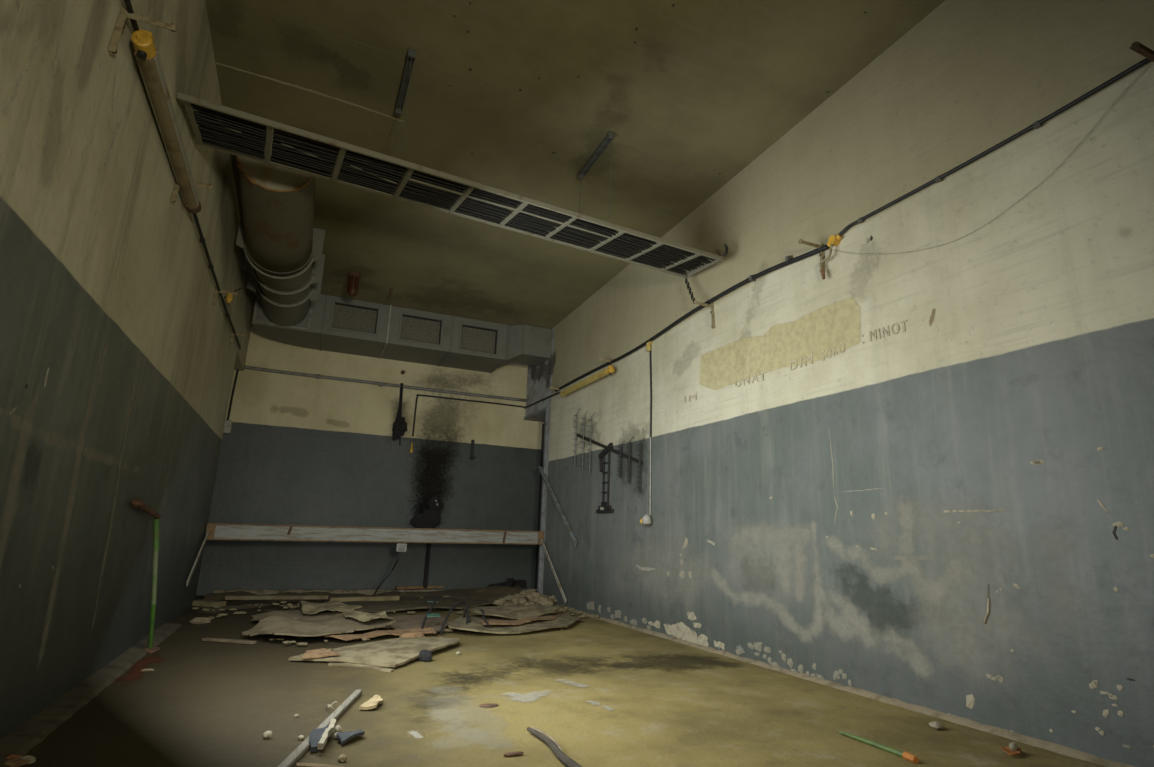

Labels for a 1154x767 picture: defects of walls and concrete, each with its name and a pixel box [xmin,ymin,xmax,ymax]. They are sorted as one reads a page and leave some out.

damp [712,523,925,675]
peeling [586,601,852,687]
peeling [966,694,975,709]
peeling [1089,678,1135,736]